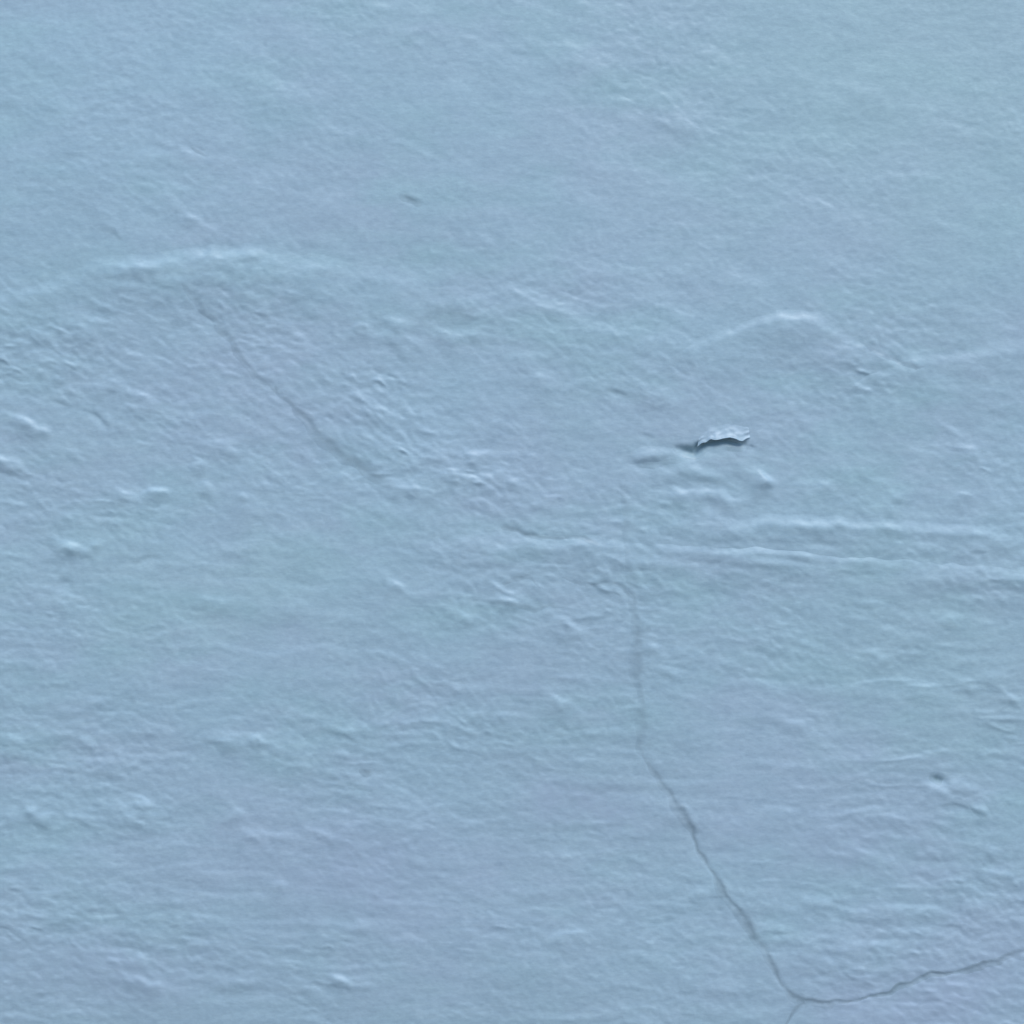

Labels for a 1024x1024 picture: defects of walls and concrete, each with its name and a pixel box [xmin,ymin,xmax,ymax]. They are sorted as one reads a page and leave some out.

spalling [626,424,750,469]
crack [501,472,1024,1024]